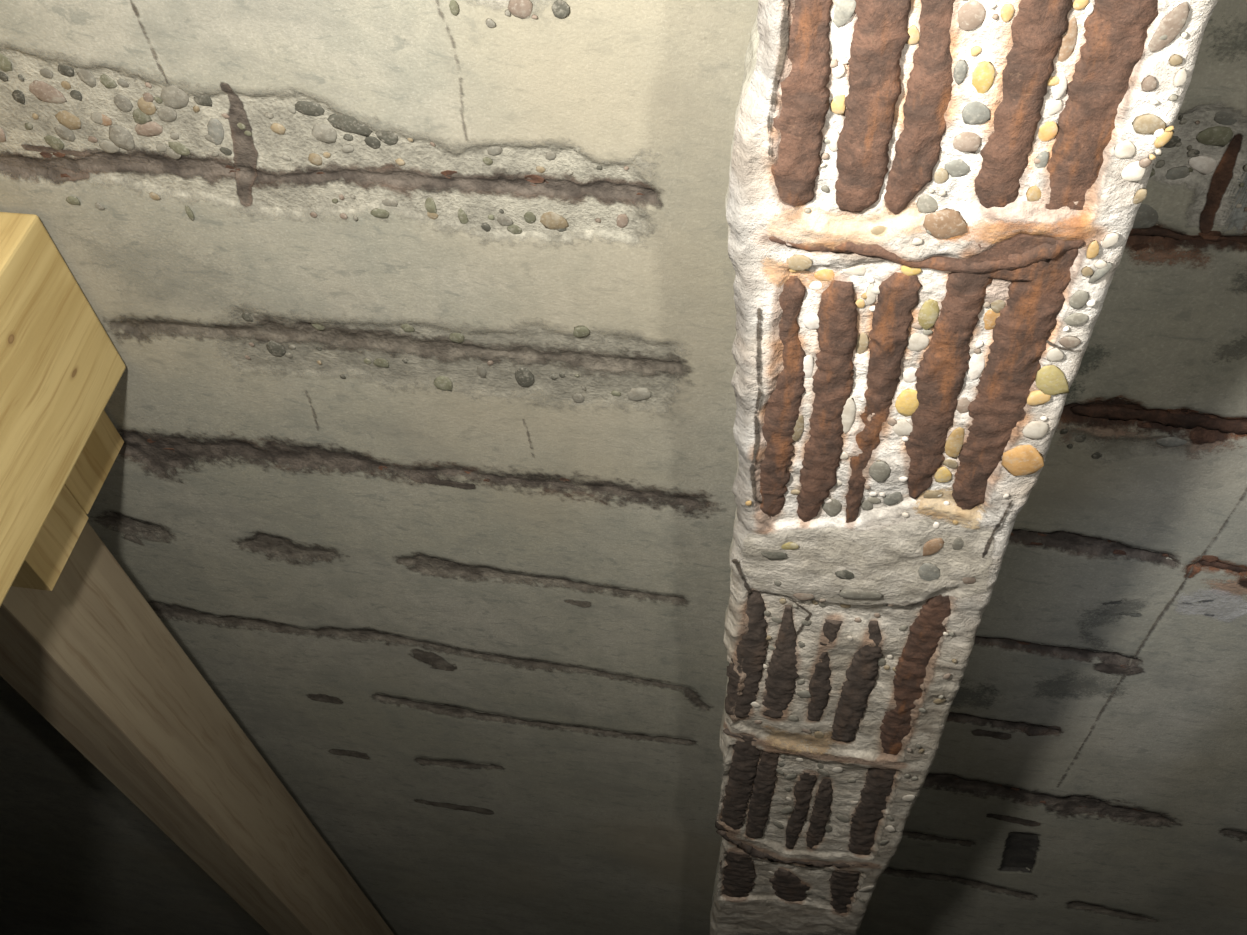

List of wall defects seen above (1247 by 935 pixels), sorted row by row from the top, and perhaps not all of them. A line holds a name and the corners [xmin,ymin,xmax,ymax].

spalling [449,0,459,15]
spalling [476,0,570,28]
spalling [0,43,654,244]
rust [762,258,832,291]
spalling [716,0,1247,913]
rust [914,489,984,529]
crack [1057,488,1247,787]
rust [765,726,832,754]